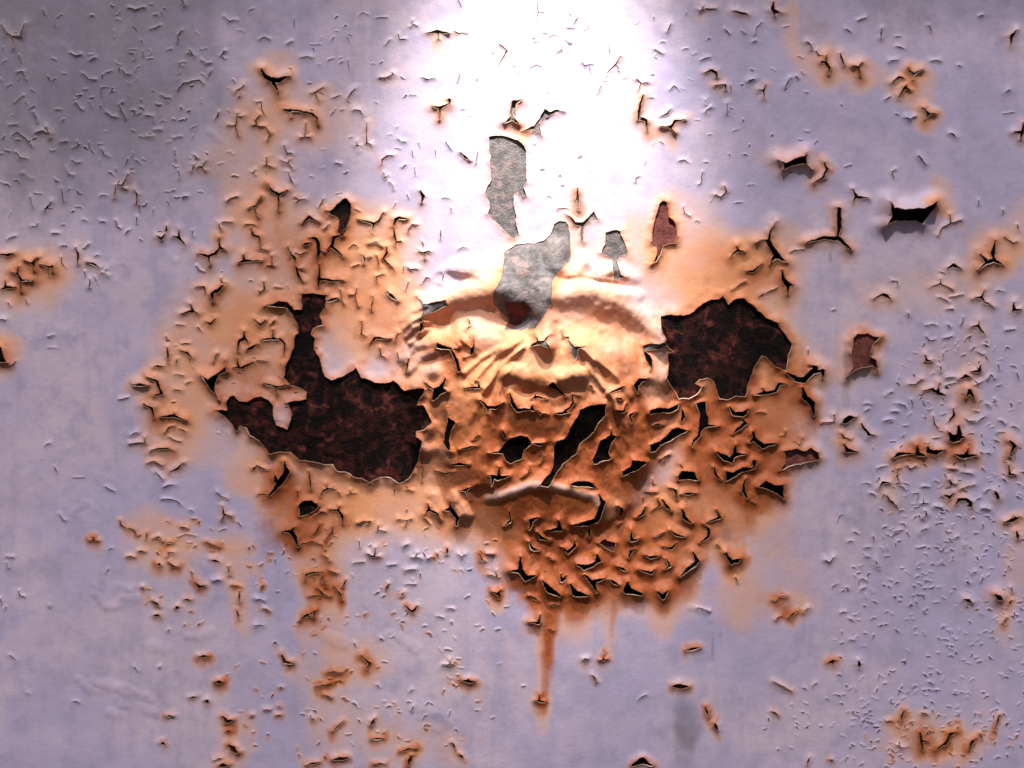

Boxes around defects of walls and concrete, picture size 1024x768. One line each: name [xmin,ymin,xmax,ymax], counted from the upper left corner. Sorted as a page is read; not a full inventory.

crack [0,14,37,59]
crack [7,116,61,154]
crack [0,234,108,307]
peeling [187,283,485,504]
crack [104,18,1024,698]
peeling [470,95,690,371]
peeling [474,134,834,518]
peeling [861,180,956,250]
corrosion [698,481,810,540]
corrosion [215,527,260,648]
corrosion [282,605,475,768]
corrosion [525,577,708,695]